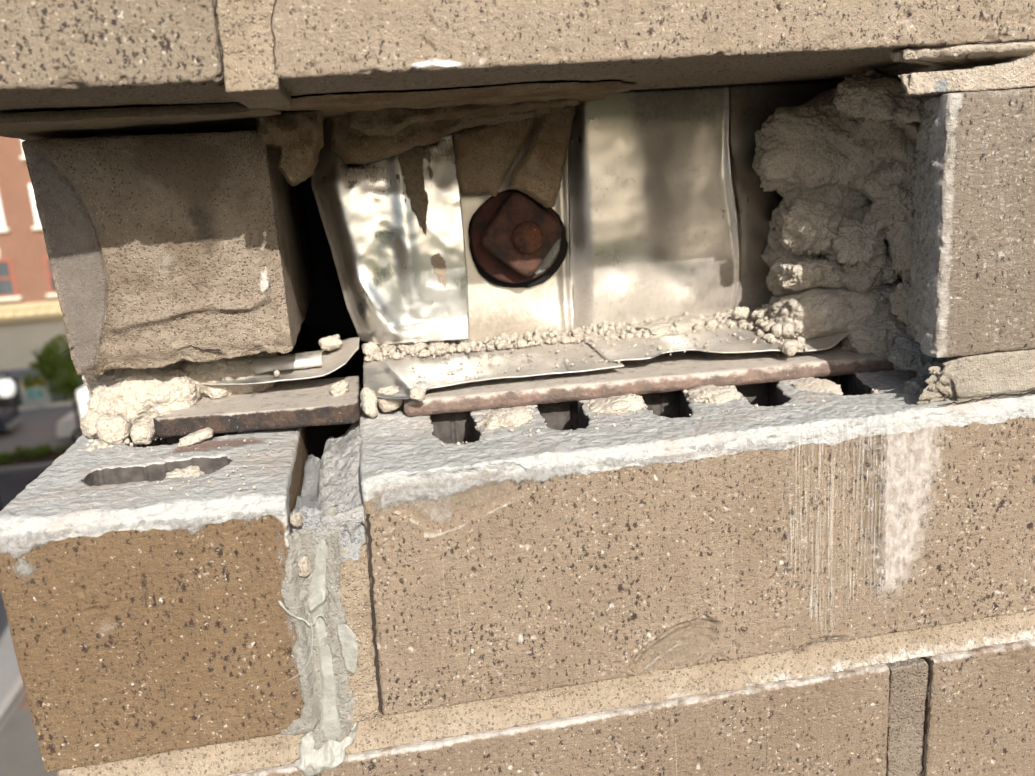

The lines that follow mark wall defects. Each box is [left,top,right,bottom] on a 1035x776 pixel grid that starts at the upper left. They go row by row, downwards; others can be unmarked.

crack [214,0,225,78]
crack [269,0,277,75]
peeling [260,268,268,292]
peeling [534,239,560,274]
leakage [863,425,935,586]
crack [366,514,383,712]